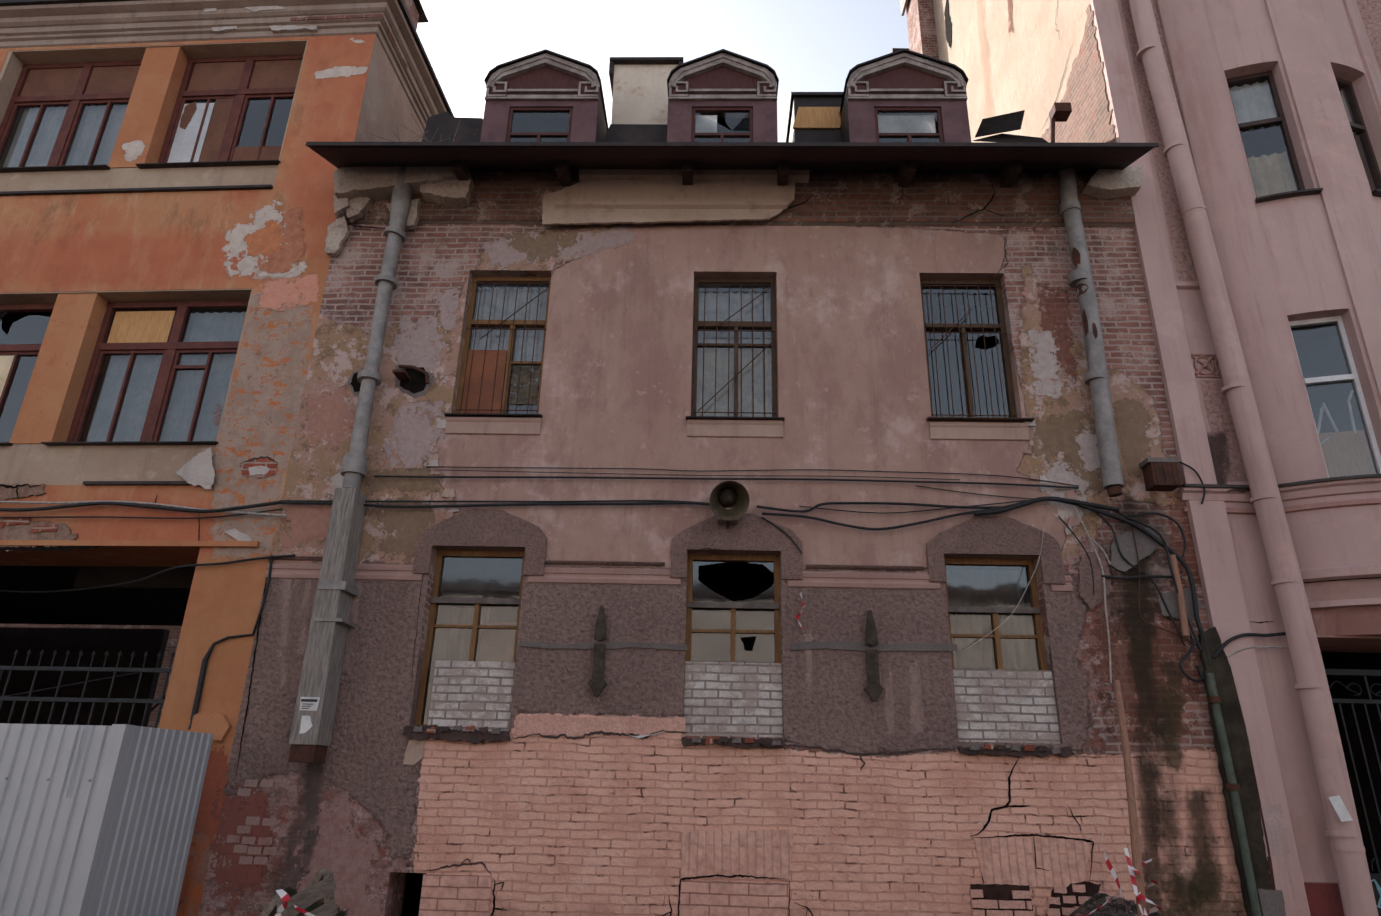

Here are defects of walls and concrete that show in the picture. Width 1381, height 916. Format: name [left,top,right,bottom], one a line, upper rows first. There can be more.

peeling [221,200,321,311]
flaking render [240,456,278,479]
flaking render [307,368,364,451]
peeling [367,287,460,560]
flaking render [1023,282,1104,535]
flaking render [1114,398,1151,477]
flaking render [279,504,332,547]
damp [1110,550,1216,916]
flaking render [178,745,382,916]
crack [970,758,1094,883]
crack [491,878,504,916]
crack [662,874,813,916]